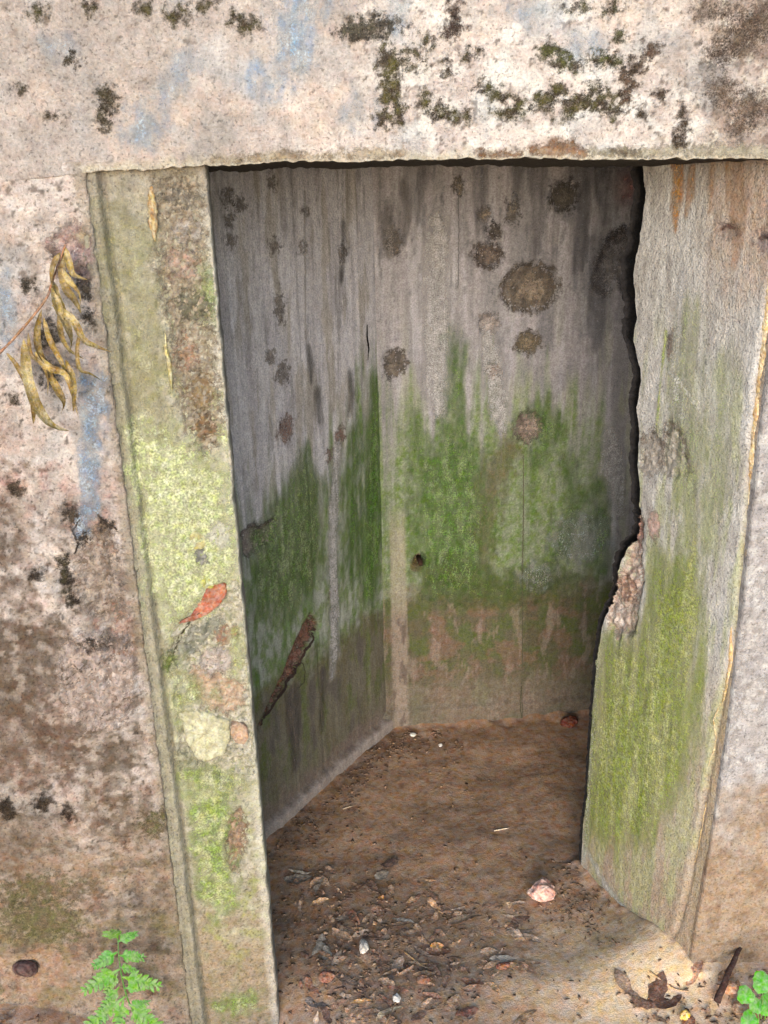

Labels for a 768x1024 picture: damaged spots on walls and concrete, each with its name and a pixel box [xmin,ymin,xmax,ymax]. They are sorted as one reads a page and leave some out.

damp [570,167,608,350]
corrosion [672,164,694,231]
damp [308,350,320,408]
damp [320,378,382,722]
damp [480,325,515,556]
damp [554,428,625,581]
crack [579,166,646,860]
damp [583,646,624,906]
peeling [585,511,704,857]